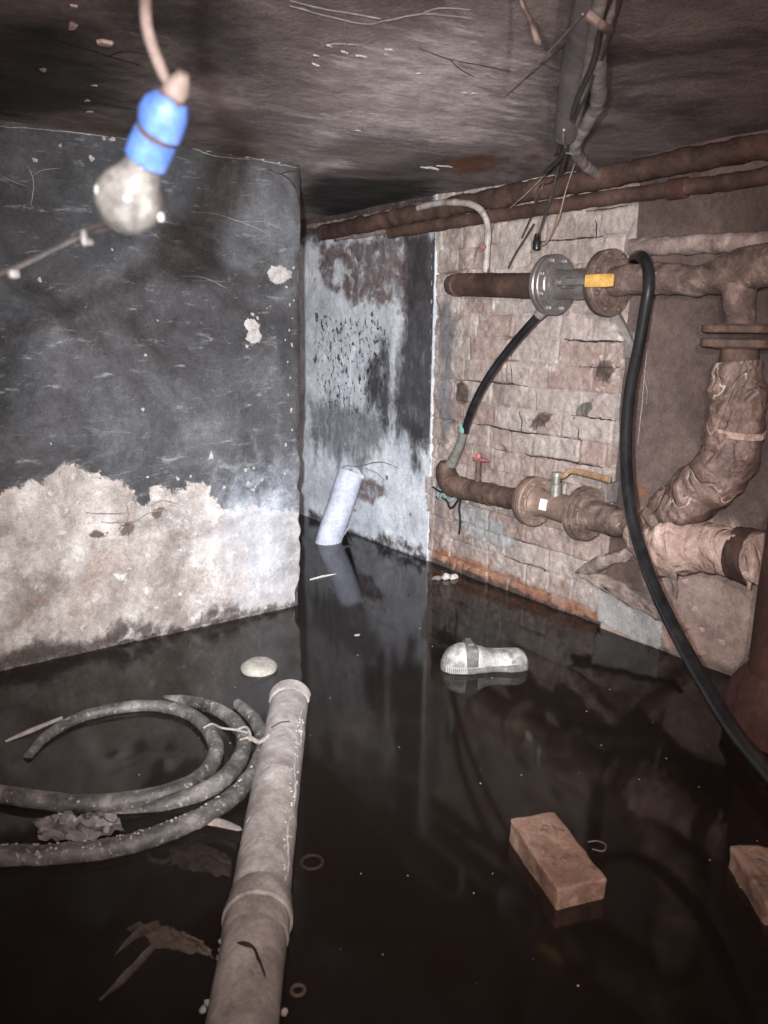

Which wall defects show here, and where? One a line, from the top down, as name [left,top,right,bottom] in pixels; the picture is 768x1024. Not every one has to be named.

spalling [244,313,262,348]
spalling [267,265,295,347]
damp [312,233,435,471]
crack [456,364,528,387]
crack [477,339,648,468]
peeling [0,461,301,670]
corrosion [433,550,553,605]
crack [487,530,548,572]